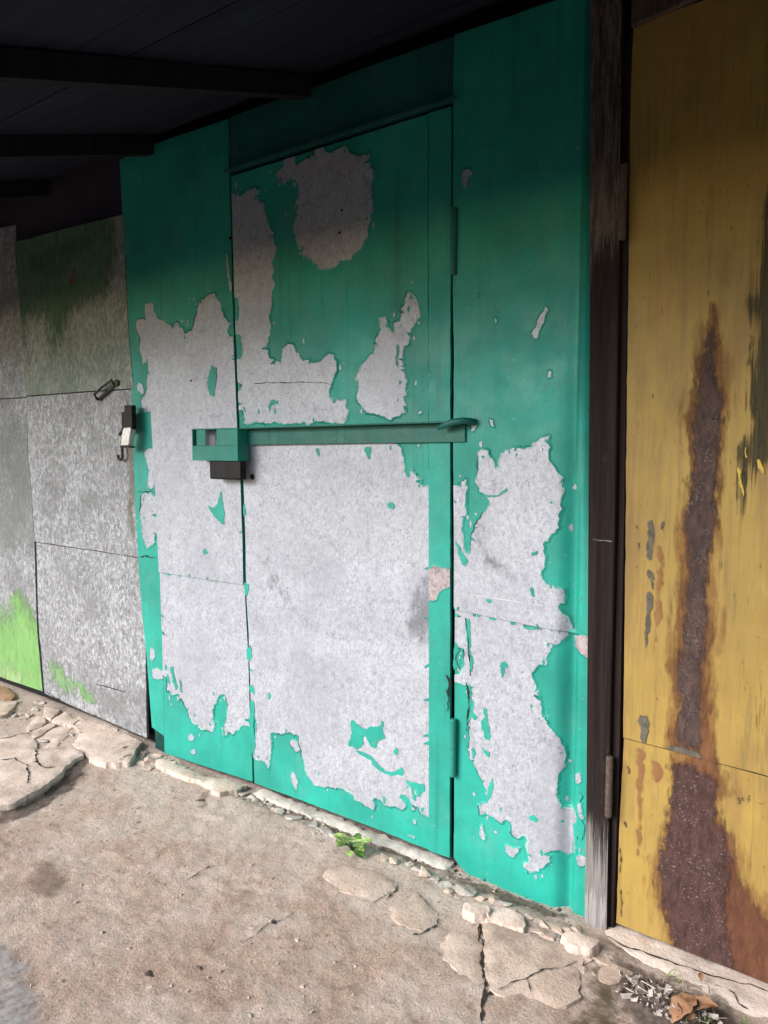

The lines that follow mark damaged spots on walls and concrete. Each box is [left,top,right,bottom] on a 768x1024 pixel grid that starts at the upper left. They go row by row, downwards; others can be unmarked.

peeling [135,145,588,880]
peeling [636,520,664,648]
corrosion [636,305,768,984]
crack [1,732,55,783]
peeling [638,715,649,743]
peeling [668,746,702,759]
crack [479,923,576,1024]